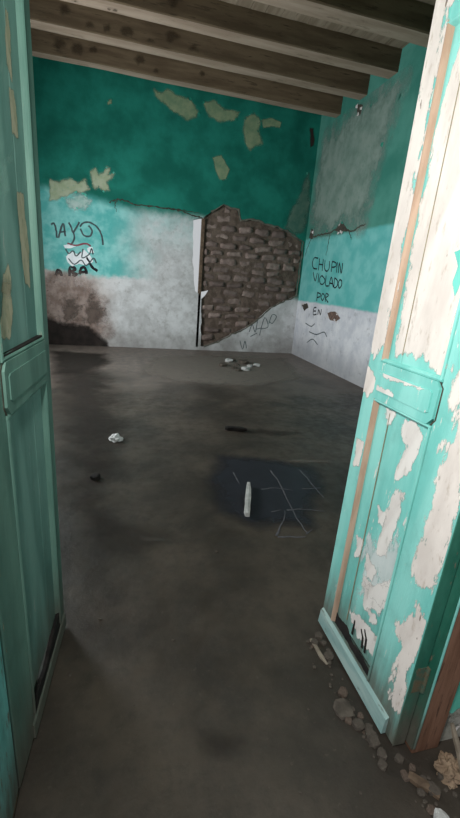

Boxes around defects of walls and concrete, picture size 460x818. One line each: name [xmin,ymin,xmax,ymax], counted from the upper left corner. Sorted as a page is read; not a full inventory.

peeling [155,90,281,150]
peeling [49,167,115,201]
crack [109,198,202,219]
spalling [200,81,402,347]
crack [305,224,365,254]
damp [45,274,111,334]
peeling [363,0,460,595]
peeling [350,407,423,656]
peeling [388,600,426,714]